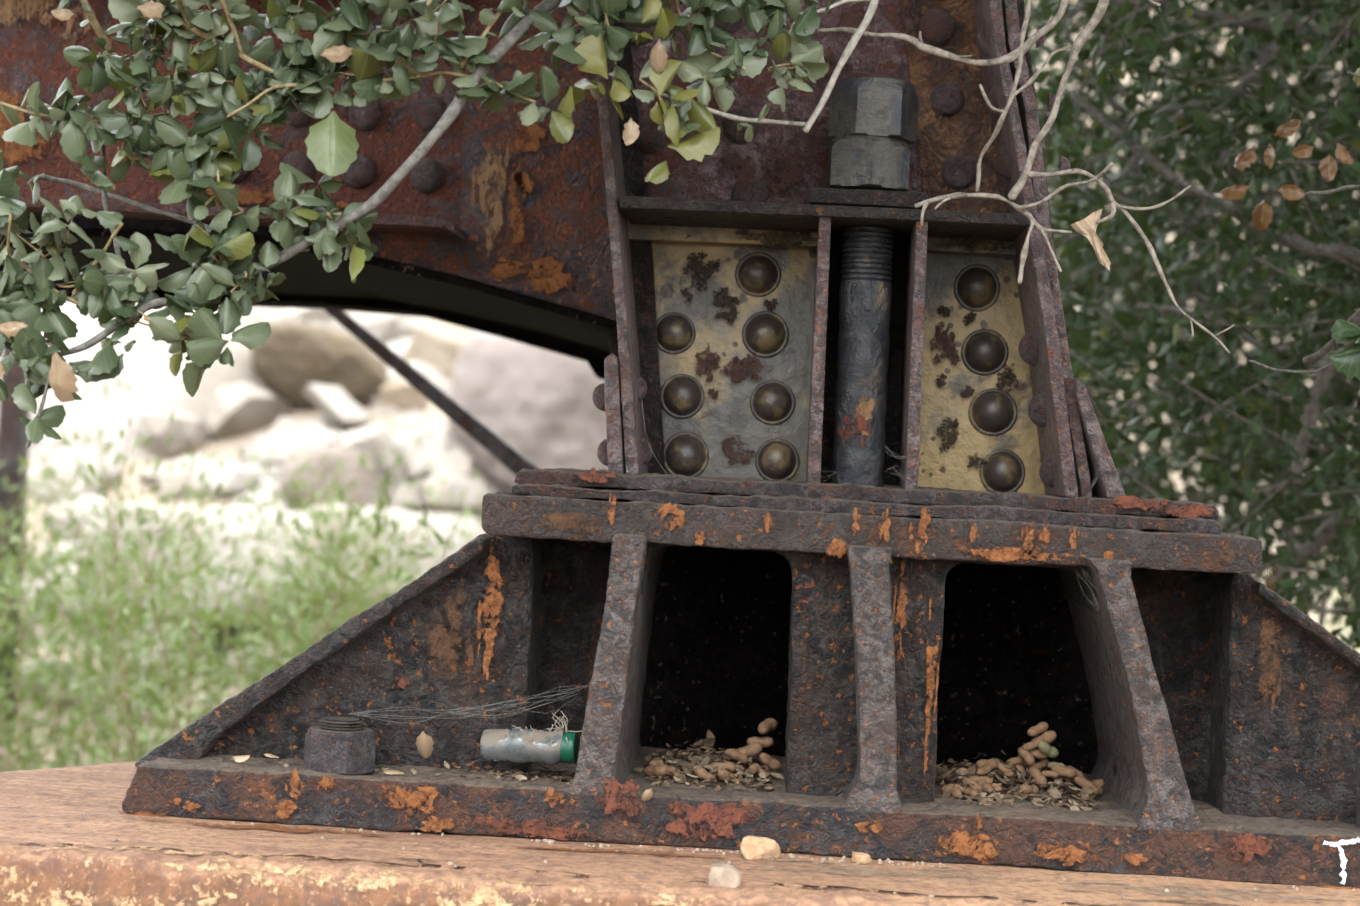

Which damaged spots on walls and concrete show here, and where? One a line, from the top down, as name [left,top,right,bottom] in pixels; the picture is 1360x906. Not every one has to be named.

corrosion [0,89,52,167]
corrosion [469,124,576,294]
corrosion [531,467,618,534]
corrosion [658,502,705,545]
corrosion [826,507,862,558]
corrosion [958,514,1086,562]
corrosion [426,540,504,681]
corrosion [924,596,939,781]
corrosion [119,768,390,837]
corrosion [378,784,755,859]
corrosion [933,813,1000,861]
corrosion [1032,841,1103,866]